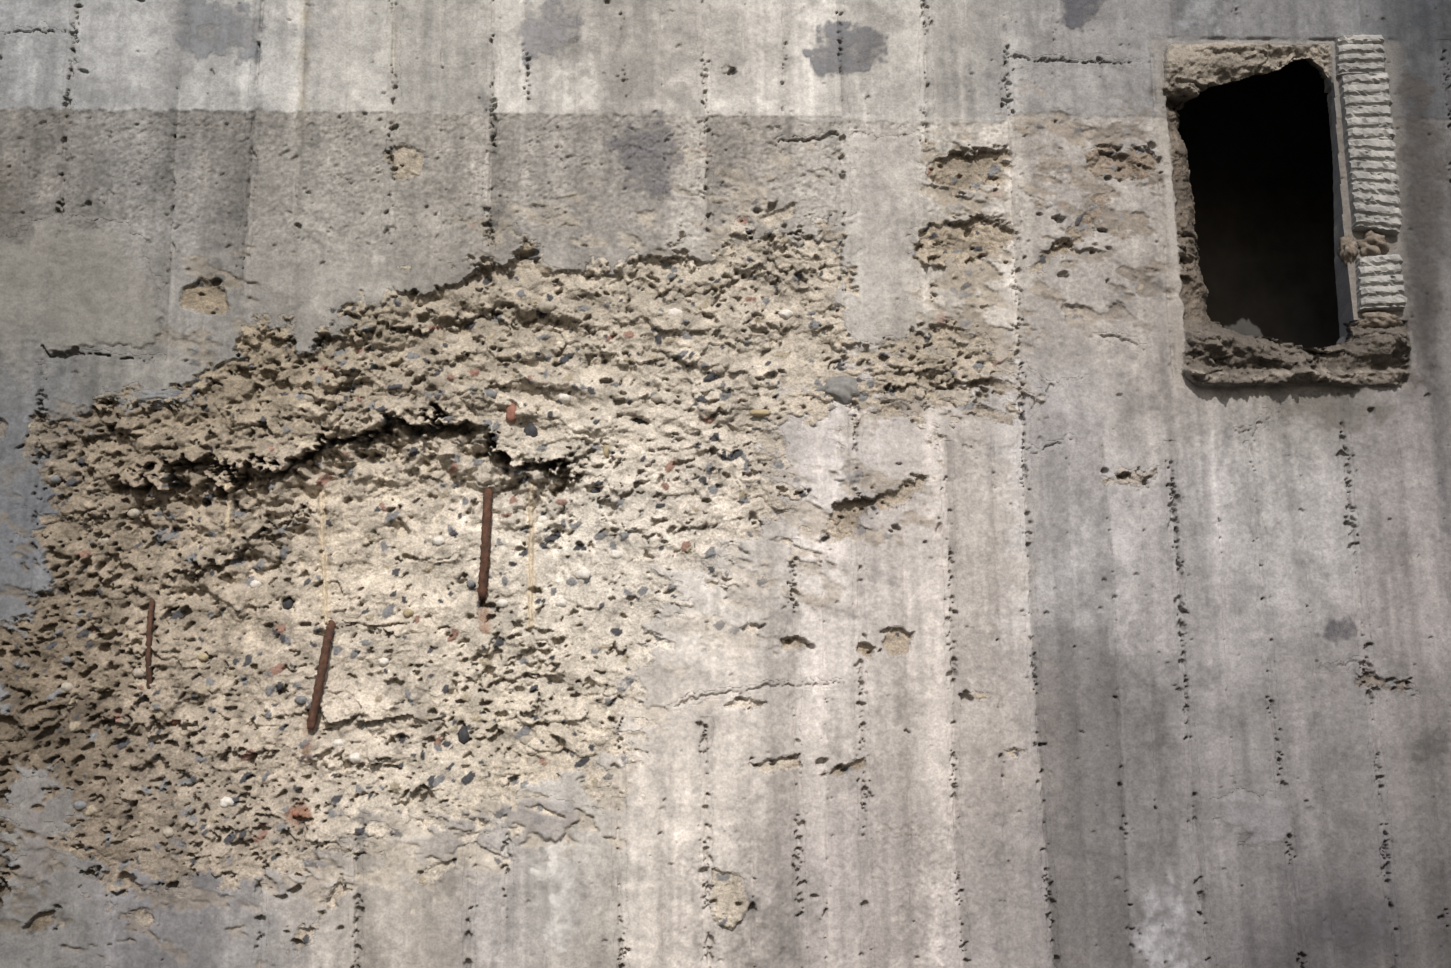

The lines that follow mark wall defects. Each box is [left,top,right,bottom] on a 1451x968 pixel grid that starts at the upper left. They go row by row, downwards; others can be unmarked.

water stain [803,20,888,77]
spalling [912,143,1021,269]
spalling [1025,141,1169,279]
rust [477,488,493,598]
spalling [0,202,1046,957]
rust [145,599,155,689]
rust [307,620,336,730]